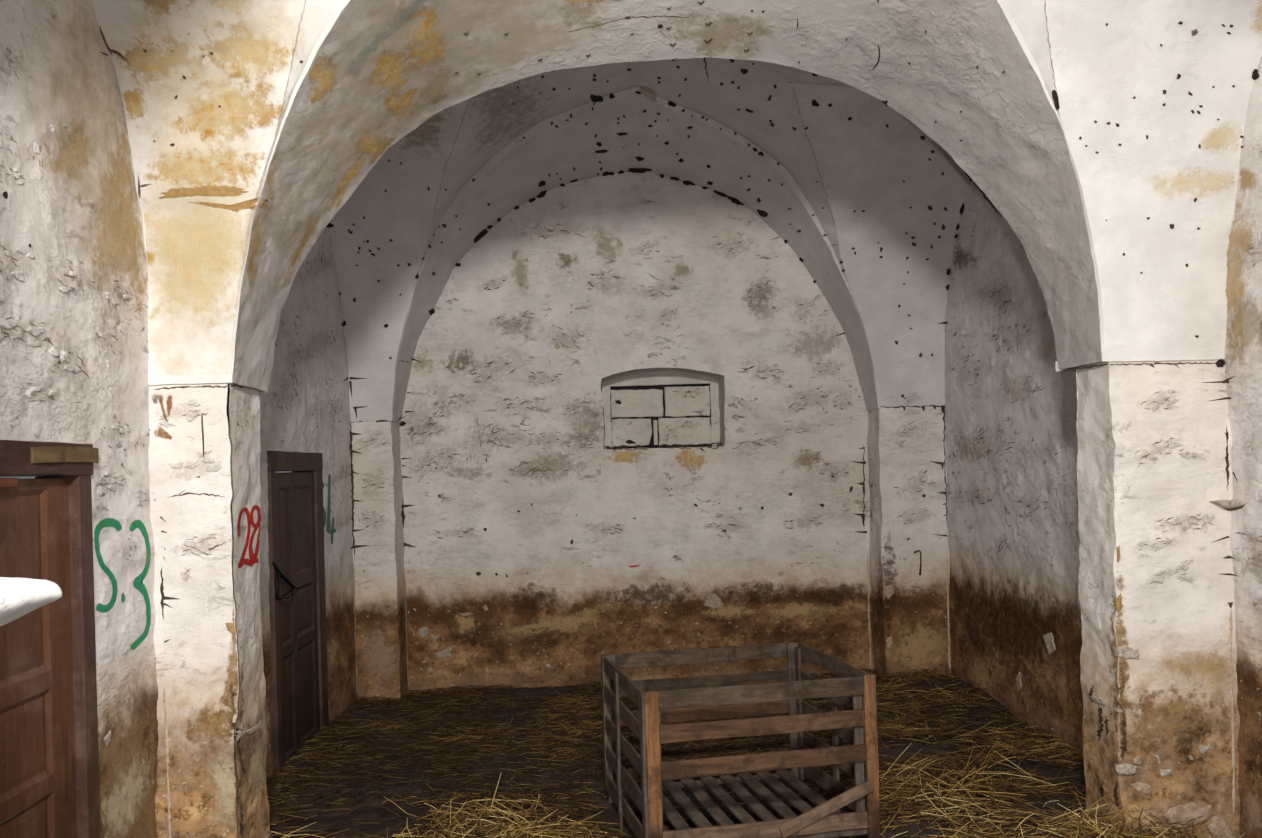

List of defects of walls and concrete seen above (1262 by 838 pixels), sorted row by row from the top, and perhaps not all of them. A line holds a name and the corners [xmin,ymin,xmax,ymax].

water stain [122,0,288,186]
water stain [308,52,335,102]
water stain [370,7,446,120]
water stain [95,135,232,310]
water stain [248,214,267,283]
water stain [287,128,392,281]
water stain [440,584,690,646]
water stain [702,583,859,620]
water stain [99,697,157,838]
water stain [211,721,266,825]
spalling [1164,802,1234,838]
water stain [1243,793,1262,830]